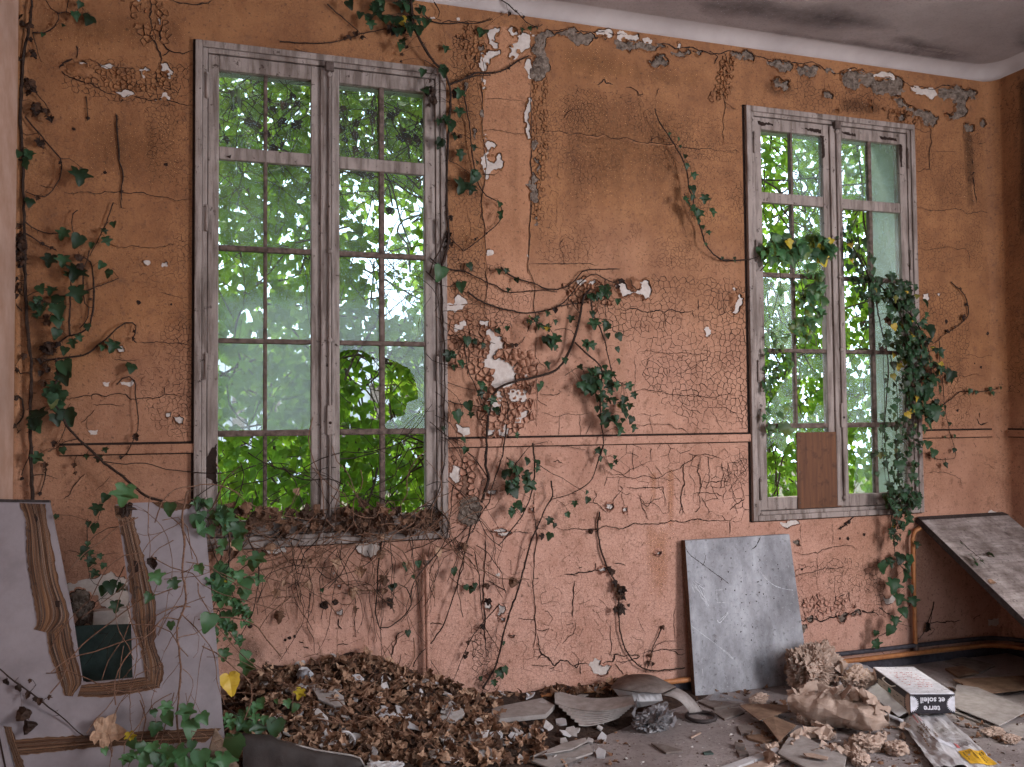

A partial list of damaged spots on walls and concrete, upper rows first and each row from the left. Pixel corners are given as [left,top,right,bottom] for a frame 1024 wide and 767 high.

peeling [115,88,137,99]
peeling [140,61,175,79]
flaking render [730,49,987,135]
peeling [472,109,505,181]
flaking render [523,97,542,226]
crack [40,0,212,439]
peeling [614,277,653,301]
peeling [447,294,534,438]
crack [432,18,1024,693]